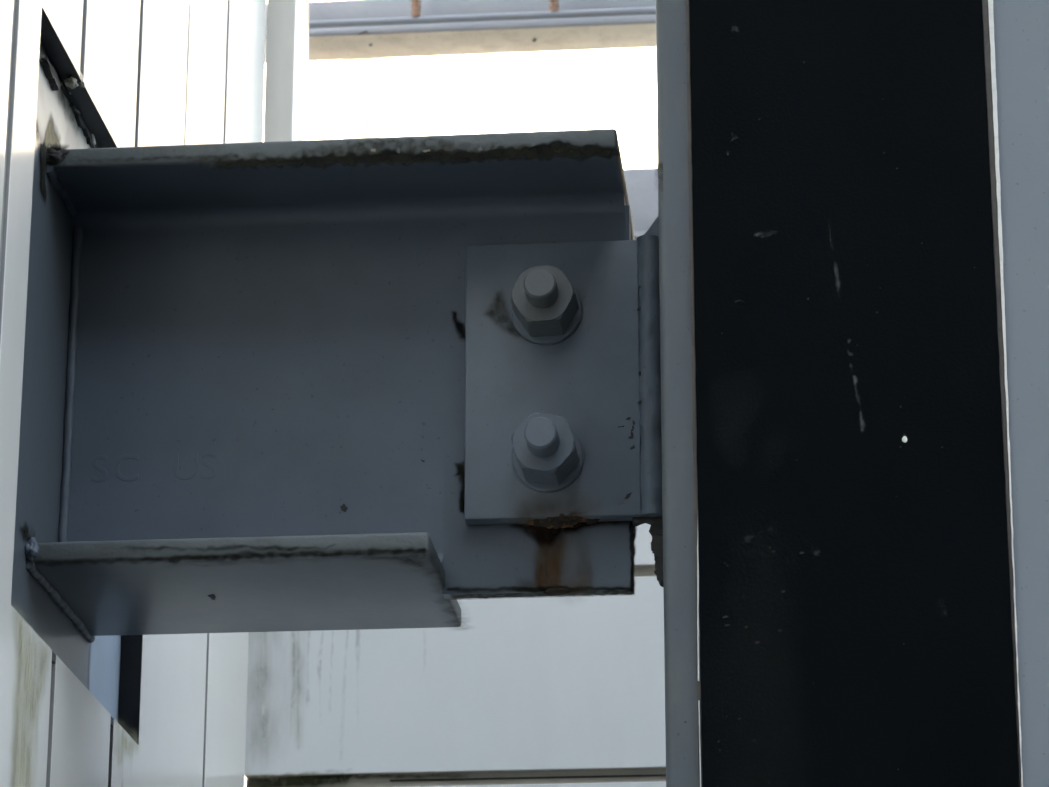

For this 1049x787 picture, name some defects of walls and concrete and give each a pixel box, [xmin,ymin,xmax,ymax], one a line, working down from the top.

corrosion [411,0,422,17]
corrosion [511,521,630,587]